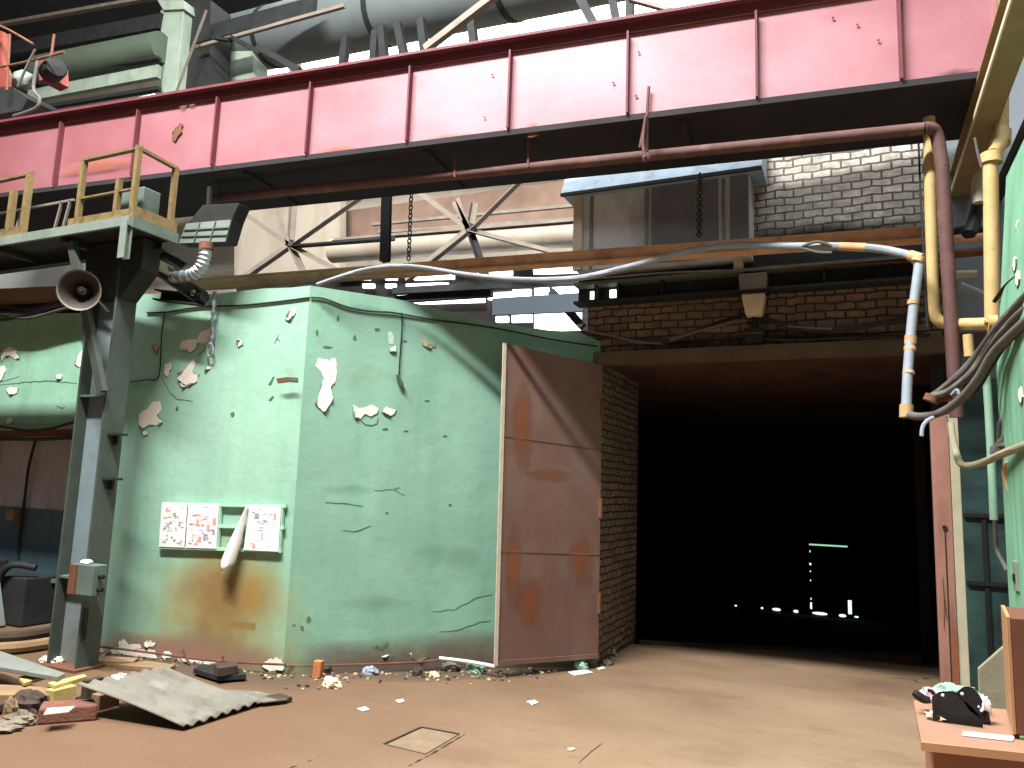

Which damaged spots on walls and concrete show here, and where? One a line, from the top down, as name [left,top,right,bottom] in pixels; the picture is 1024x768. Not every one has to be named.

peeling [0,347,20,397]
peeling [151,329,212,389]
peeling [315,330,337,413]
peeling [138,401,163,437]
peeling [352,405,396,430]
crack [325,487,403,532]
corrosion [184,566,260,651]
crack [433,594,491,632]